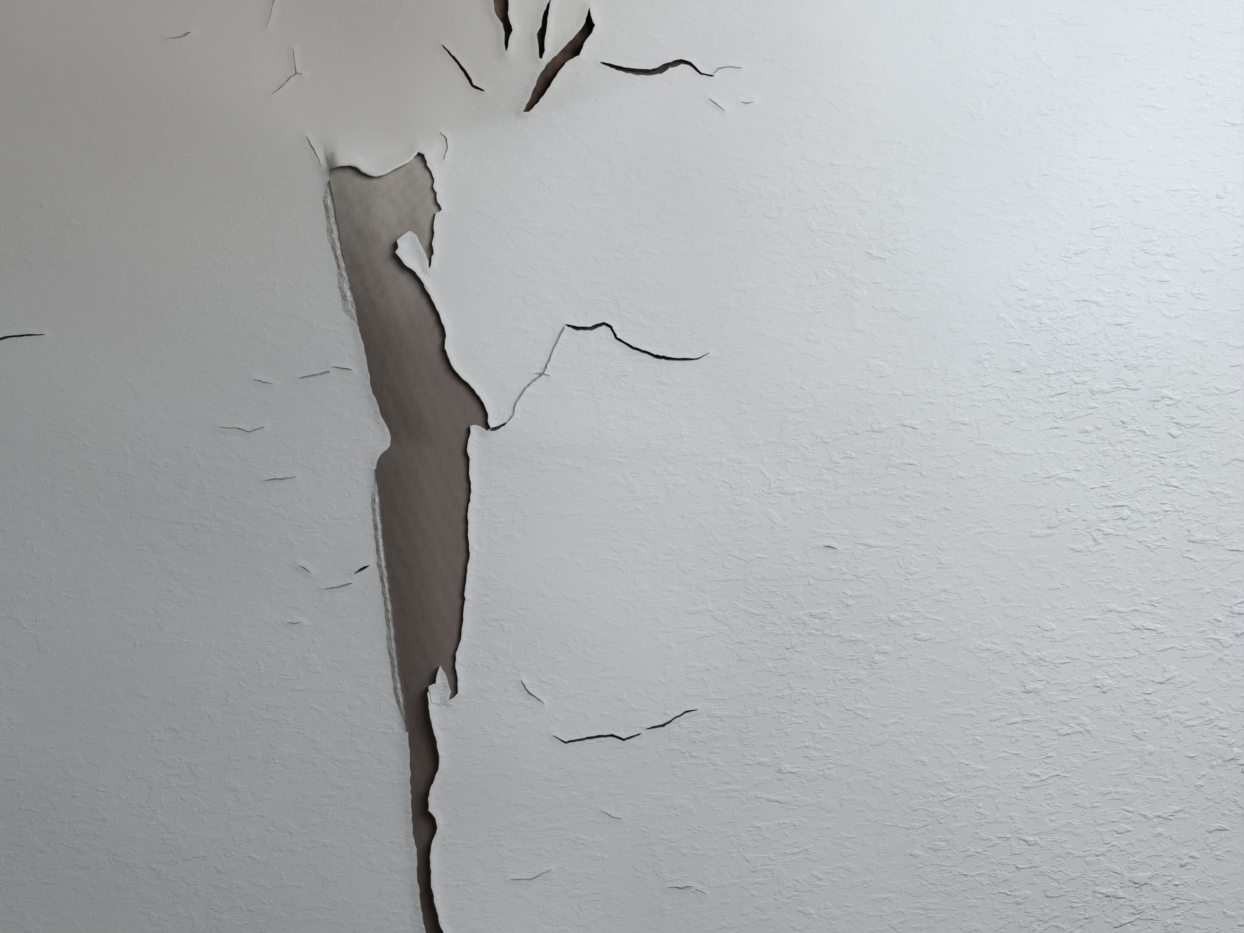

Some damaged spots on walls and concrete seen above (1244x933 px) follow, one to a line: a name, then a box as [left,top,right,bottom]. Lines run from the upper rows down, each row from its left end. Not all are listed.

crack [493,0,752,112]
crack [0,333,45,341]
crack [490,322,709,431]
peeling [322,137,491,933]
crack [521,680,544,704]
crack [553,709,697,744]